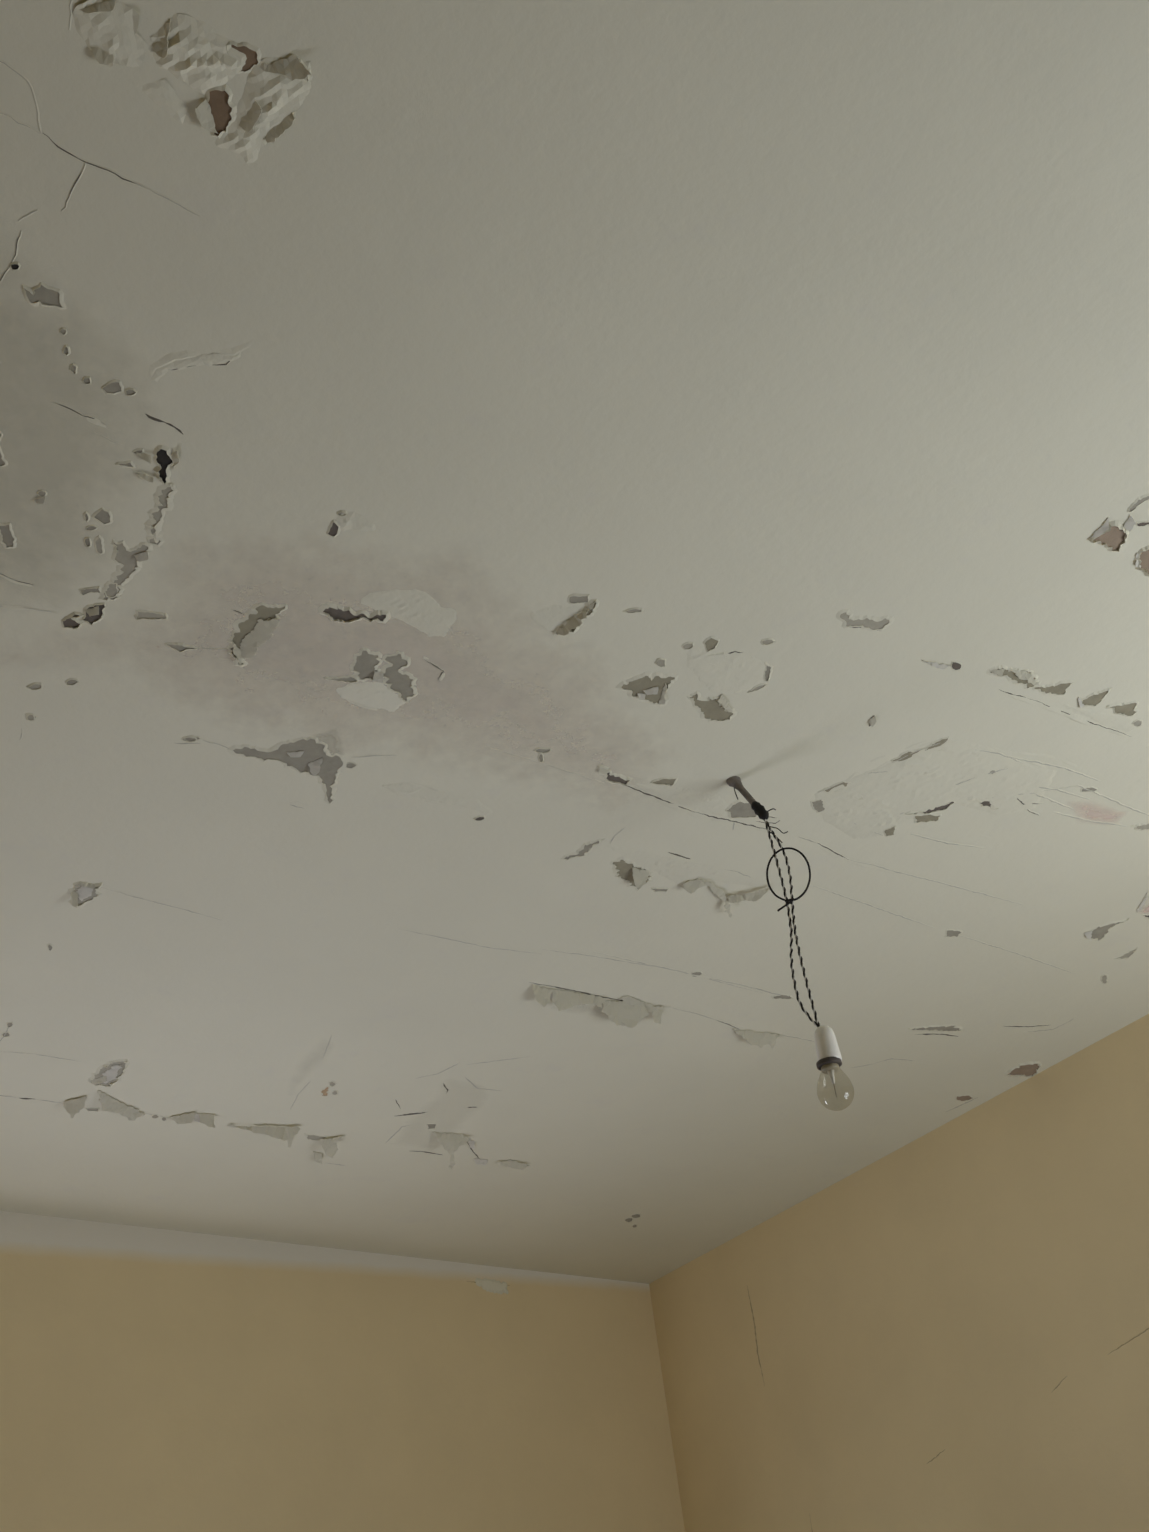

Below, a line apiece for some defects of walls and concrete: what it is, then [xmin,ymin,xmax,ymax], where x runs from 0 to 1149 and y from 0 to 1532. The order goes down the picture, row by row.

peeling [73,0,313,166]
crack [0,59,200,283]
crack [51,401,122,446]
crack [145,413,184,435]
peeling [61,445,180,629]
peeling [1087,493,1149,577]
peeling [615,636,776,722]
peeling [986,665,1143,738]
peeling [175,735,397,805]
peeling [561,827,772,918]
crack [799,836,1073,973]
peeling [63,1059,345,1165]